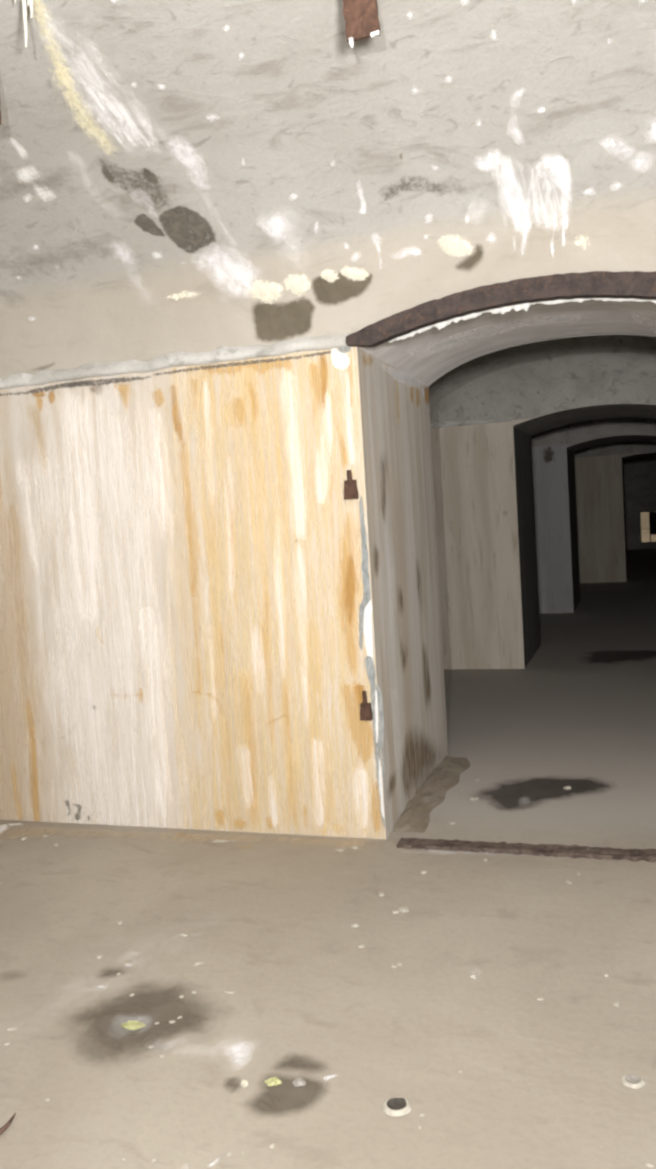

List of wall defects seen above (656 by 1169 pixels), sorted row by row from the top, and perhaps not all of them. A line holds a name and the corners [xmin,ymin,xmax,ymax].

water stain [11,139,52,201]
peeling [100,159,168,237]
water stain [168,138,206,186]
water stain [264,215,285,238]
water stain [476,151,589,257]
water stain [167,290,199,301]
rust [30,383,130,473]
rust [153,347,383,838]
rust [0,477,49,821]
water stain [72,963,211,1061]
water stain [231,1044,249,1064]
water stain [225,1055,336,1115]